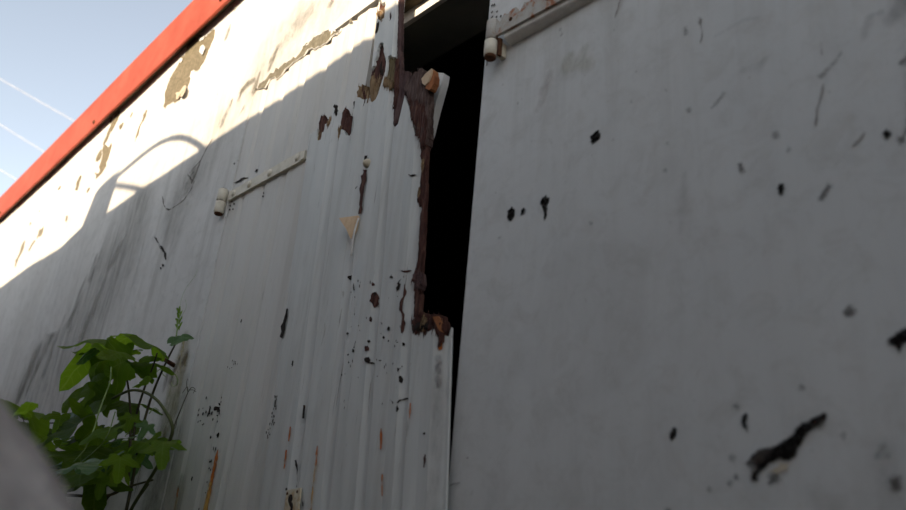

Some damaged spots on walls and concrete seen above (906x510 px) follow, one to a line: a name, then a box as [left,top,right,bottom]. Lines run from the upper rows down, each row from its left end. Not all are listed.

peeling [163,28,216,109]
spalling [257,19,352,90]
peeling [75,109,149,193]
peeling [346,270,412,384]
spalling [888,328,906,353]
rust [203,450,218,510]
spalling [747,413,827,484]